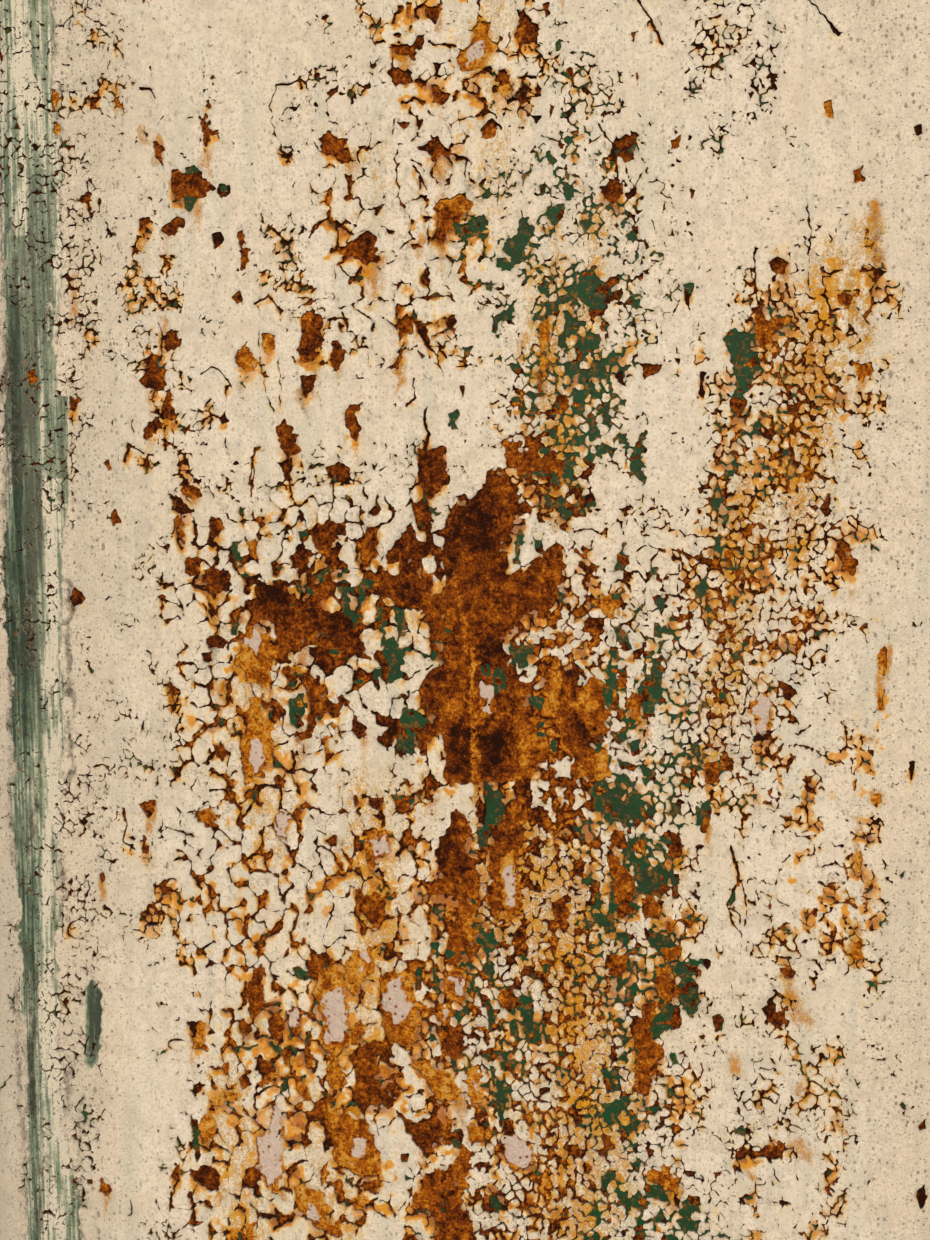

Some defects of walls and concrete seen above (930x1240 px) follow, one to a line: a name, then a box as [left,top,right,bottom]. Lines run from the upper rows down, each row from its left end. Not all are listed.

peeling [0,21,134,532]
crack [415,319,441,369]
corrosion [587,212,613,279]
crack [598,121,627,206]
peeling [668,0,787,167]
crack [201,366,262,511]
corrosion [700,200,885,761]
corrosion [242,254,640,1240]
crack [726,845,753,953]
peeling [8,946,112,1240]
corrosion [204,1064,264,1240]
peeling [312,1153,430,1235]